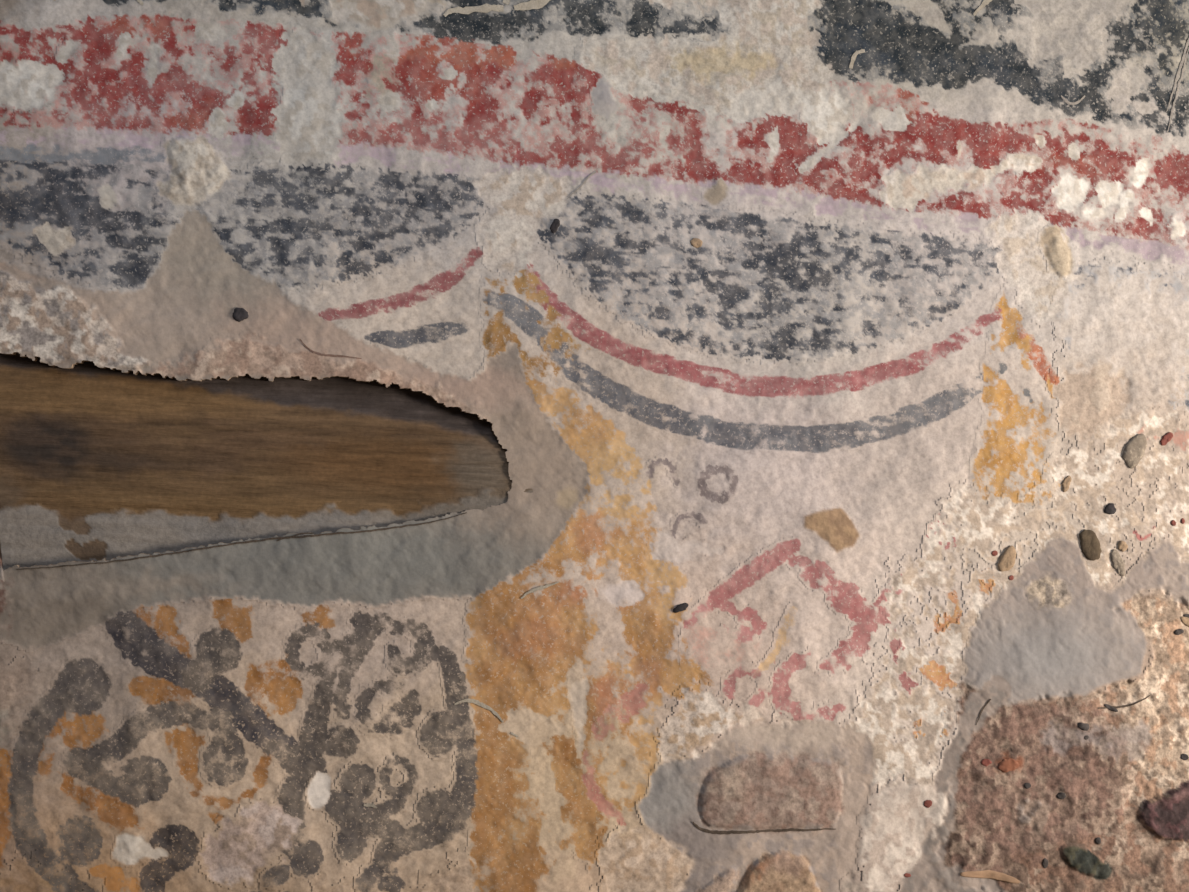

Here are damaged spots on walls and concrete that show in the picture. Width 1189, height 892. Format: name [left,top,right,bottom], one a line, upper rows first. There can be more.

flaking render [0,266,491,422]
flaking render [845,132,1189,892]